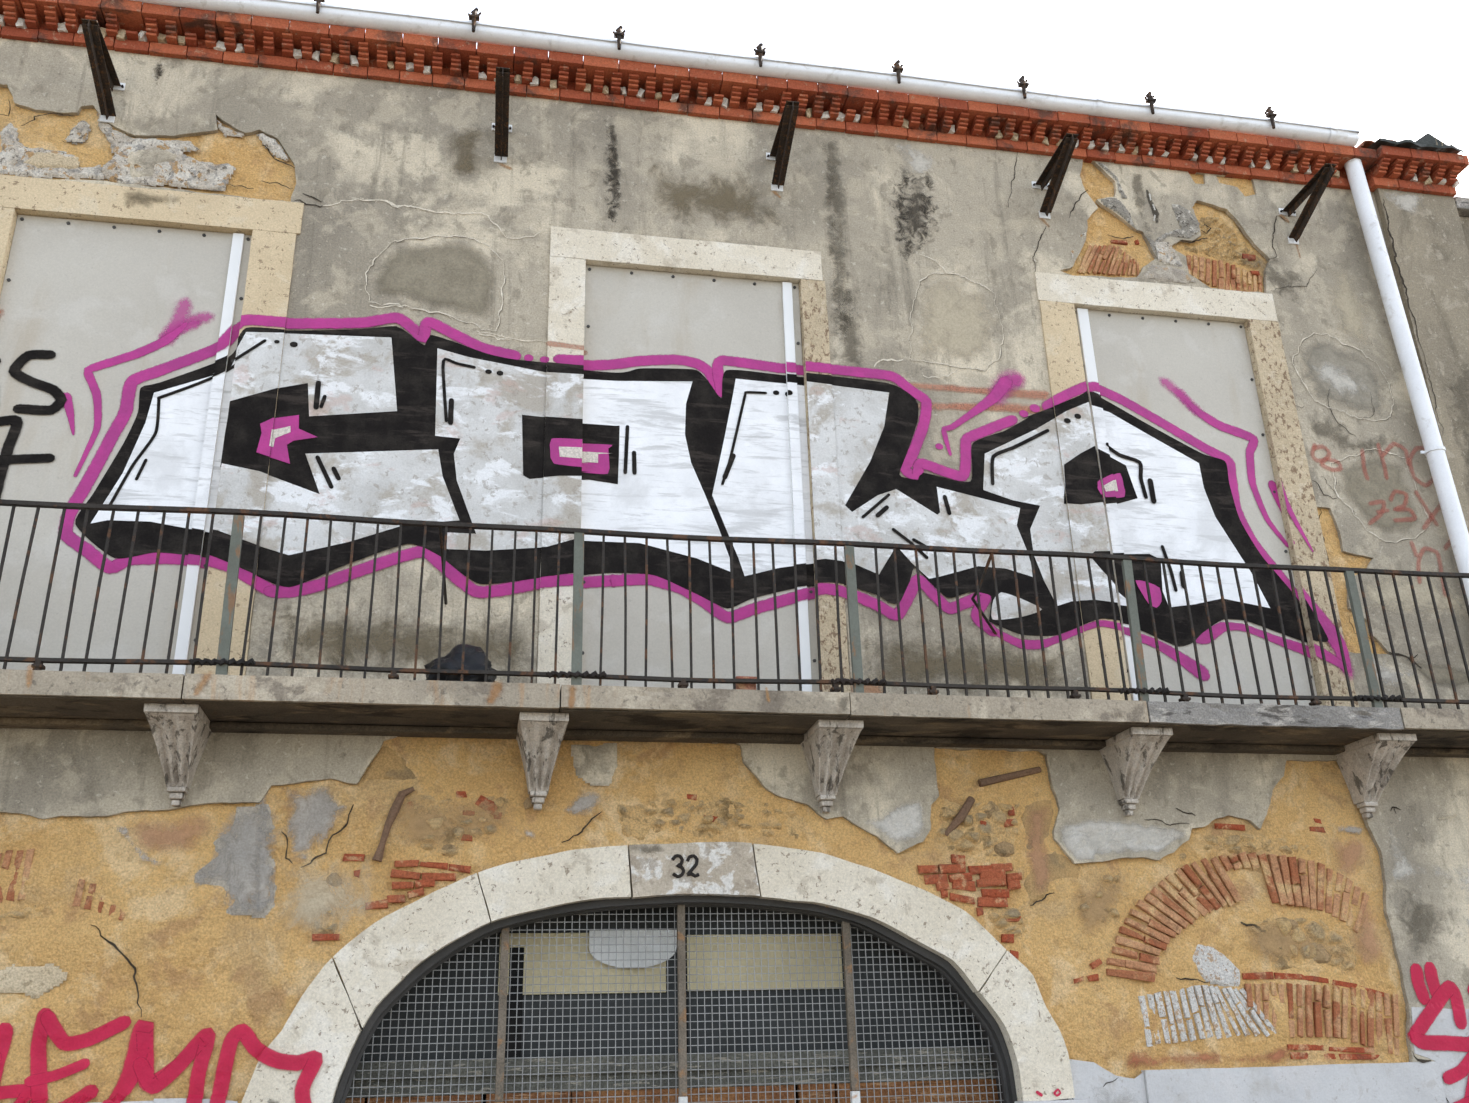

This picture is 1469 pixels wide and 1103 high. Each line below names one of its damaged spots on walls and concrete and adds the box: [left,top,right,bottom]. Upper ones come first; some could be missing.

flaking render [0,87,296,202]
water stain [896,149,937,251]
flaking render [1063,162,1154,278]
flaking render [1172,174,1268,293]
crack [874,358,966,378]
flaking render [1317,509,1387,654]
flaking render [0,737,1409,1103]